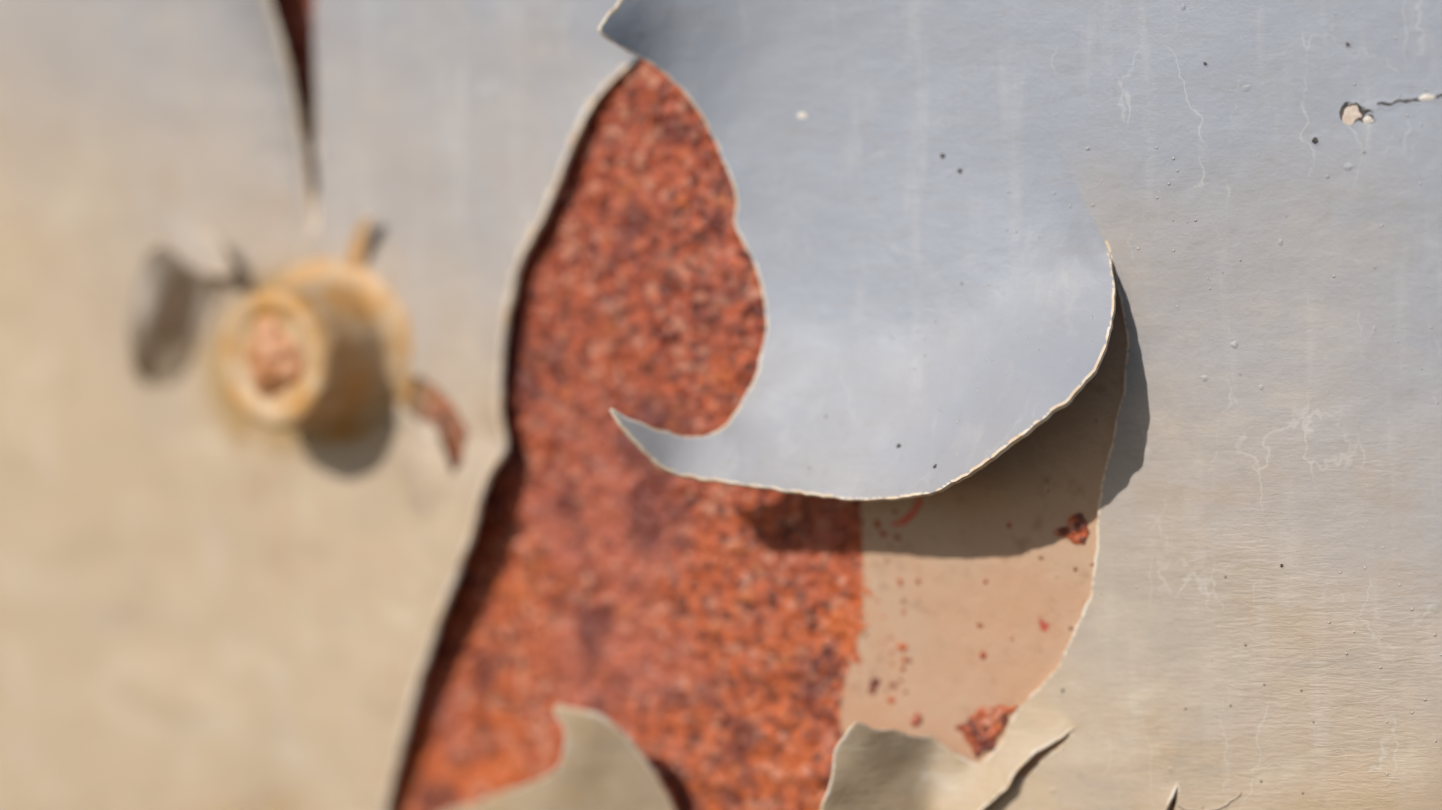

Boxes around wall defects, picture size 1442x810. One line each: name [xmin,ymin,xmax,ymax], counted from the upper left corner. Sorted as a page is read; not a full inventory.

corrosion [272,0,318,206]
crack [1339,90,1442,125]
peeling [334,0,1116,810]
corrosion [390,57,913,810]
corrosion [1053,513,1090,545]
corrosion [910,712,923,727]
corrosion [955,705,1018,760]